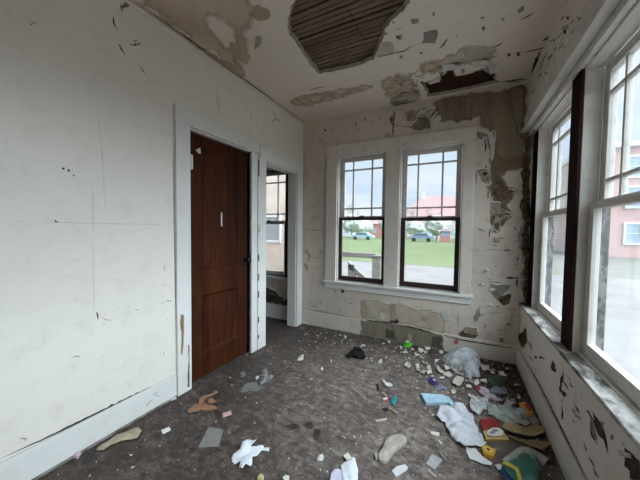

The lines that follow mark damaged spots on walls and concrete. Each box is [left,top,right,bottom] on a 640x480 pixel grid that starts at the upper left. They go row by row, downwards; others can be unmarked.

spalling [287,0,410,74]
peeling [291,84,373,106]
spalling [381,42,503,131]
spalling [458,122,533,339]
peeling [360,300,451,351]
spalling [518,328,545,372]
peeling [551,361,573,420]
crack [1,387,149,459]
peeling [572,402,614,453]
spalling [617,442,640,480]